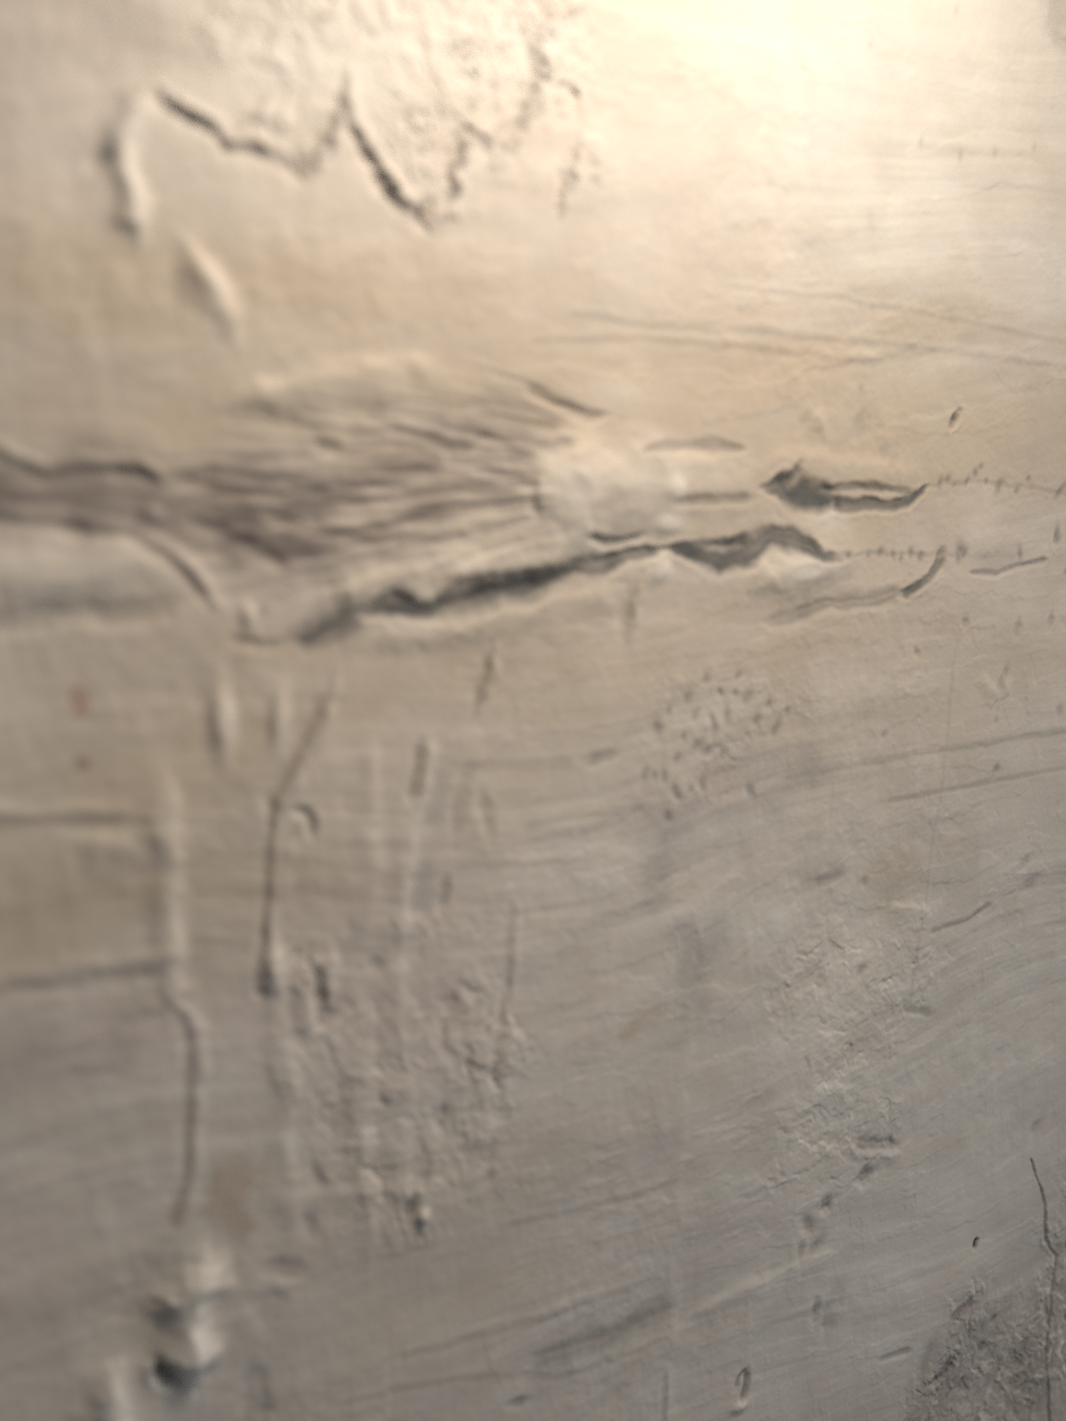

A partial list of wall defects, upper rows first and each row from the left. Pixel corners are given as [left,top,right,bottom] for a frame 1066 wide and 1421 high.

crack [223,460,1066,663]
flaking render [902,1233,1066,1421]